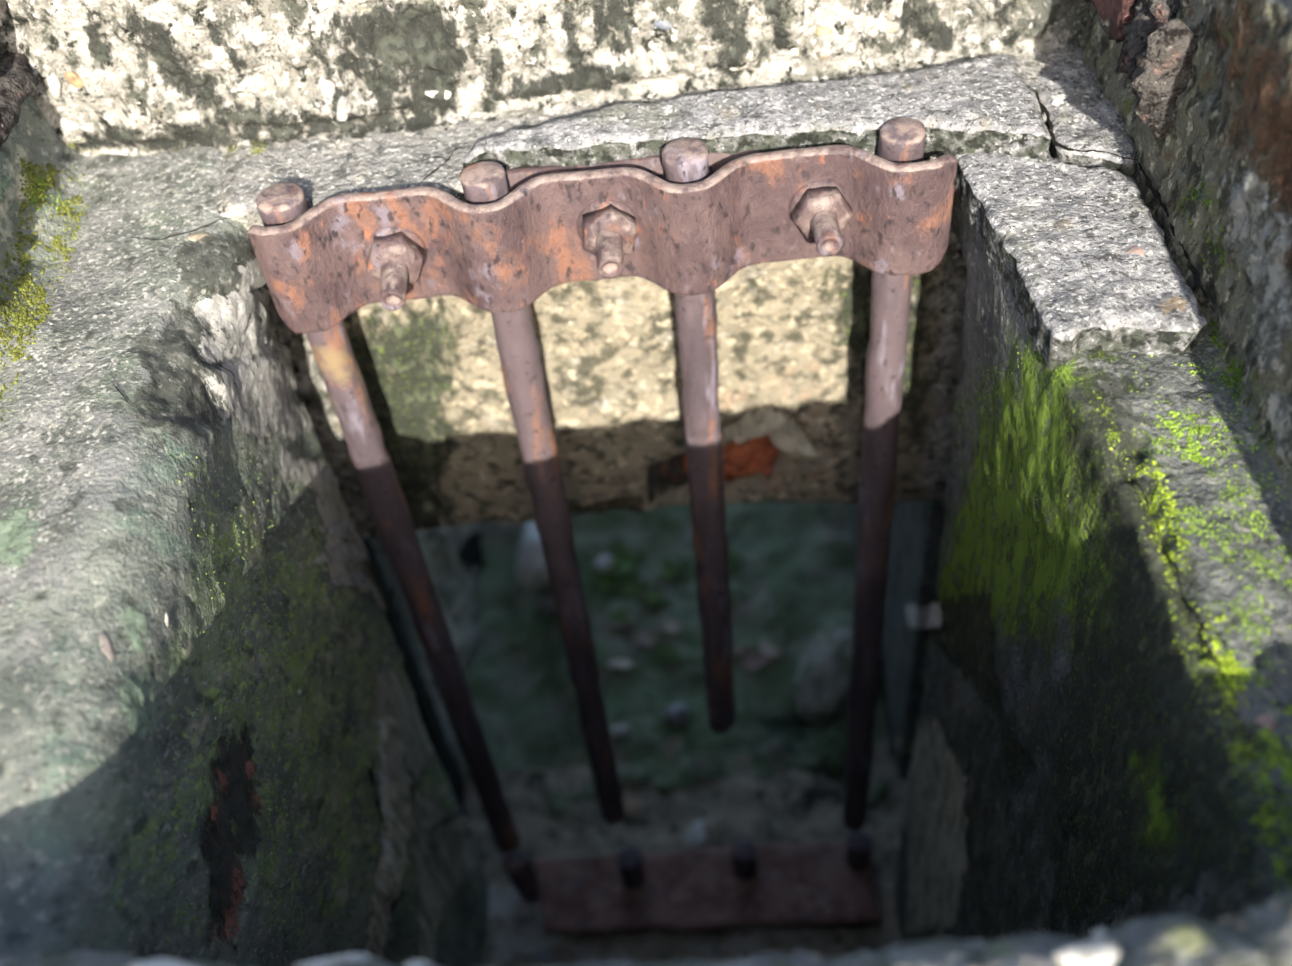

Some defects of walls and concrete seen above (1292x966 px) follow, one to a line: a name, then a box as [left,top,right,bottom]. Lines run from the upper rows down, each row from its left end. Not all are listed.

crack [1026,85,1216,313]
damp [928,586,1031,809]
damp [1047,349,1292,932]
crack [1131,481,1242,716]
spalling [199,723,263,951]